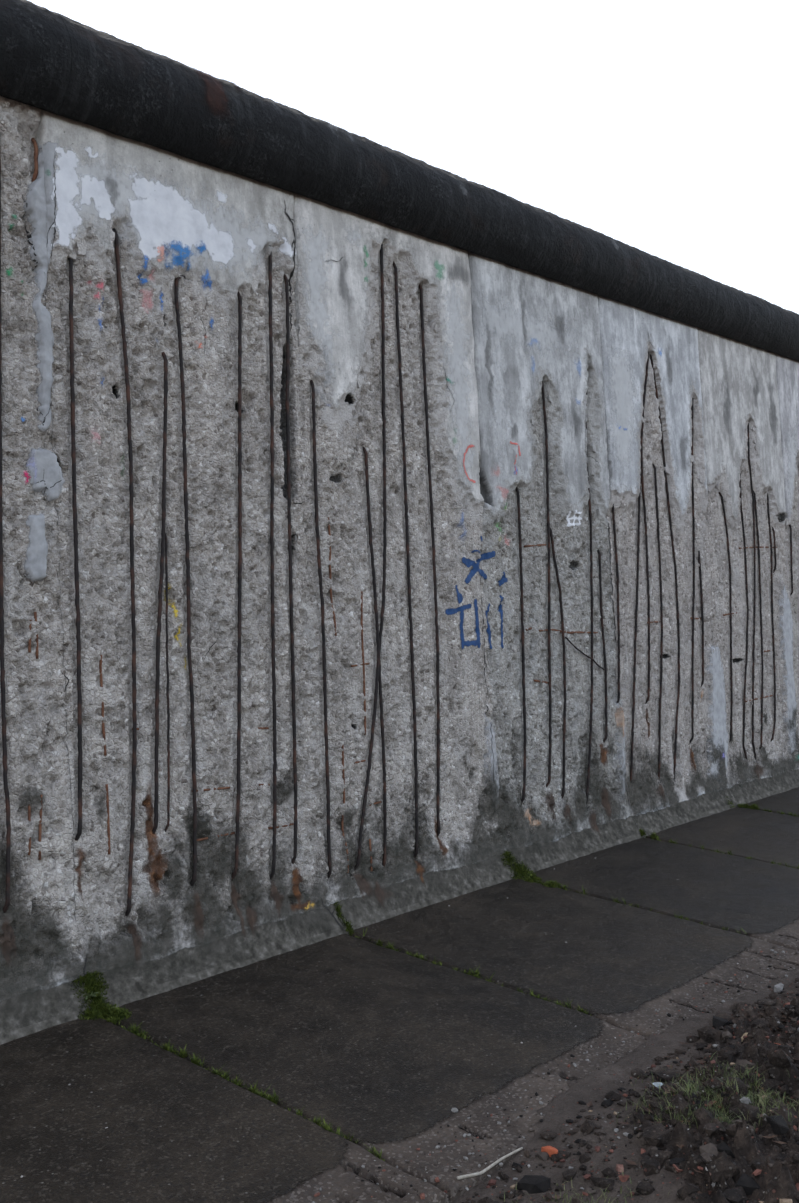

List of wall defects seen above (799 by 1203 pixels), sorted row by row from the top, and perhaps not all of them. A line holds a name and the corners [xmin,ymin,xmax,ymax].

spalling [0,96,799,982]
corrosion [142,795,168,894]
corrosion [271,870,310,915]